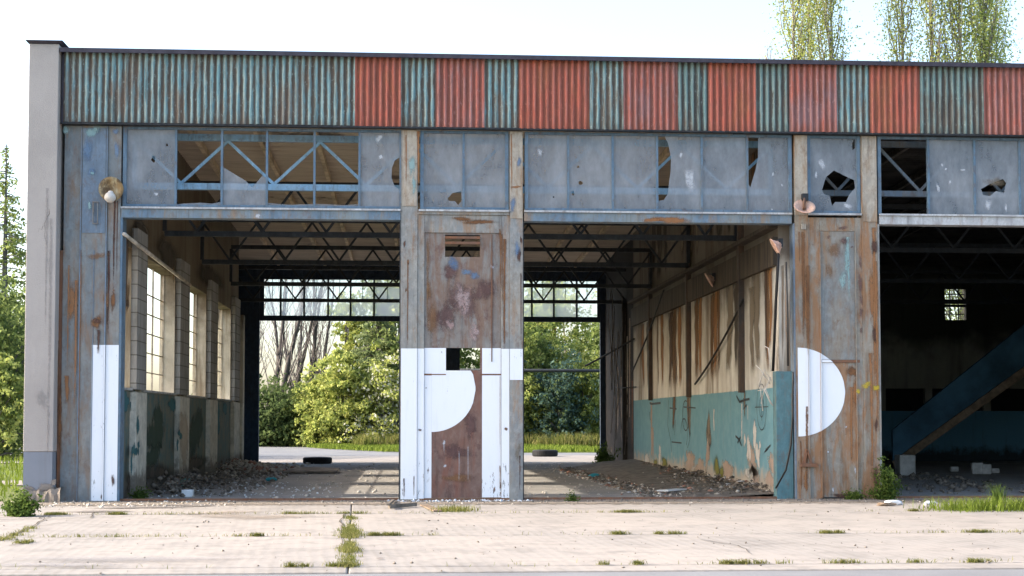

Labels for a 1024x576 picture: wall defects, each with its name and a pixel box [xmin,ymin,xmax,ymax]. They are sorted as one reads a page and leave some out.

rust [54,201,130,452]
peeling [457,287,469,313]
leakage [726,273,760,368]
rust [798,232,810,344]
rust [828,226,879,488]
peeling [684,438,710,471]
peeling [723,404,774,489]
rust [800,406,808,491]